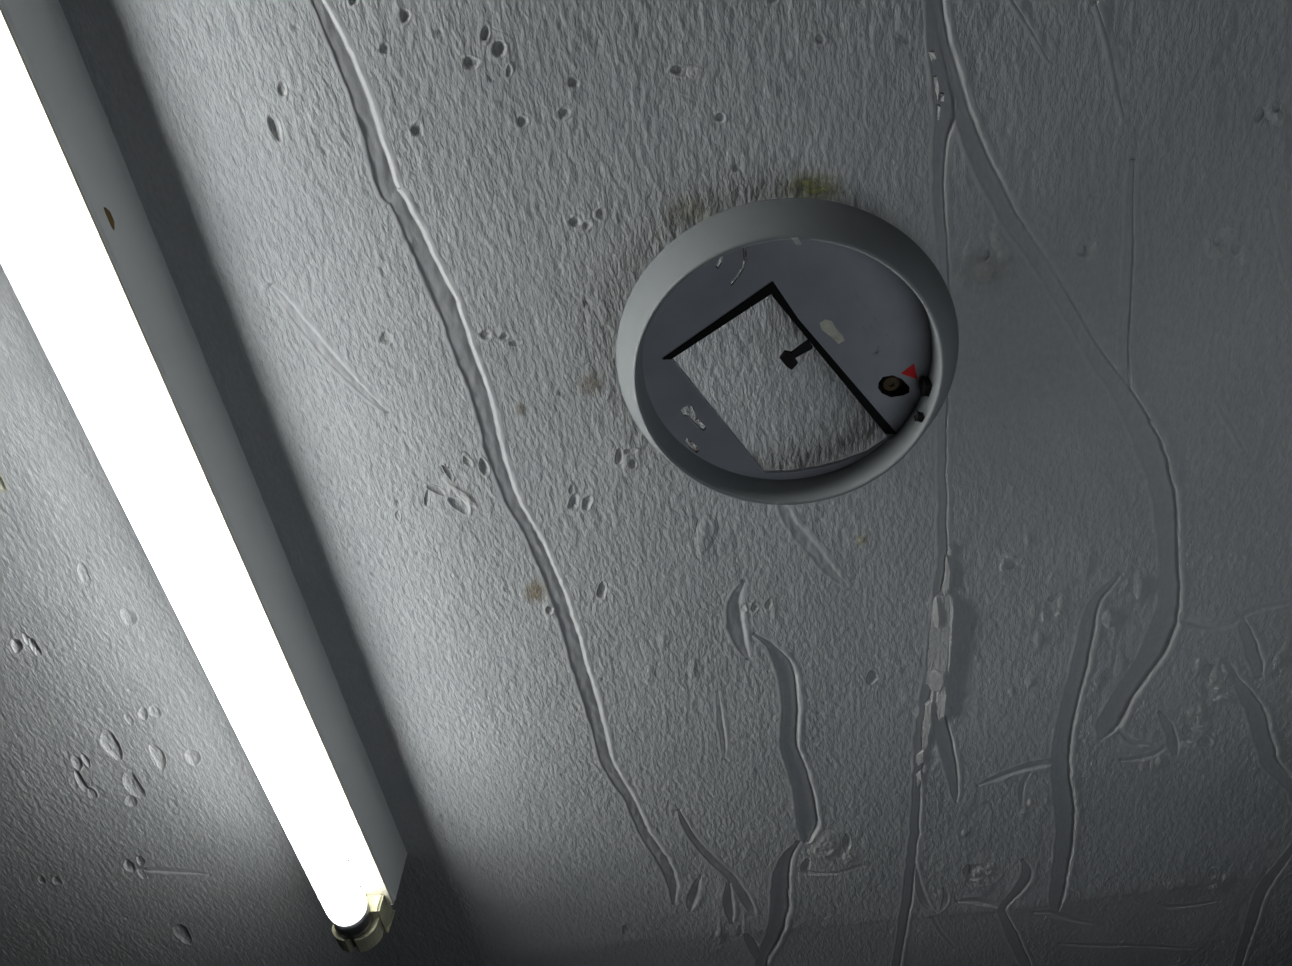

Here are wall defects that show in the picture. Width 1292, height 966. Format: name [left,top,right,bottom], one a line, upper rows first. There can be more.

crack [306,0,824,966]
crack [775,505,853,590]
spalling [915,544,954,787]
crack [890,0,1292,966]